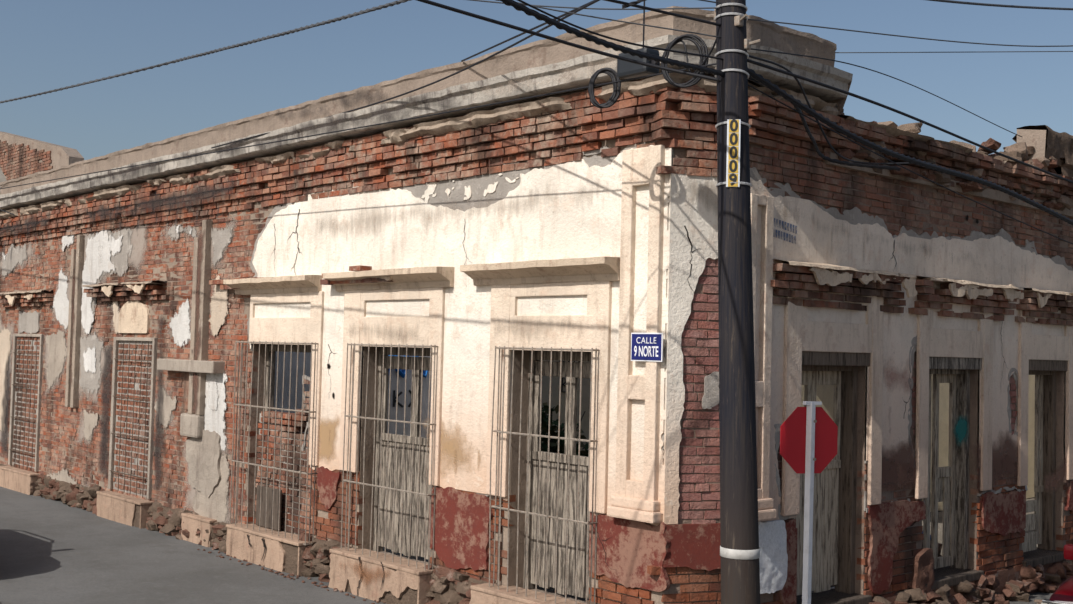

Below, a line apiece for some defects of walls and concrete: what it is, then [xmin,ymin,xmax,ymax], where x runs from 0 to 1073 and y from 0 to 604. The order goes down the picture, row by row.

crack [271,209,302,275]
spalling [418,174,521,208]
crack [684,226,700,297]
peeling [808,267,917,298]
spalling [749,131,1073,269]
spalling [0,207,268,524]
spalling [678,258,720,524]
spalling [310,468,365,545]
spalling [430,495,516,584]
spalling [856,463,925,598]
spalling [970,468,1025,575]
spalling [589,572,655,604]